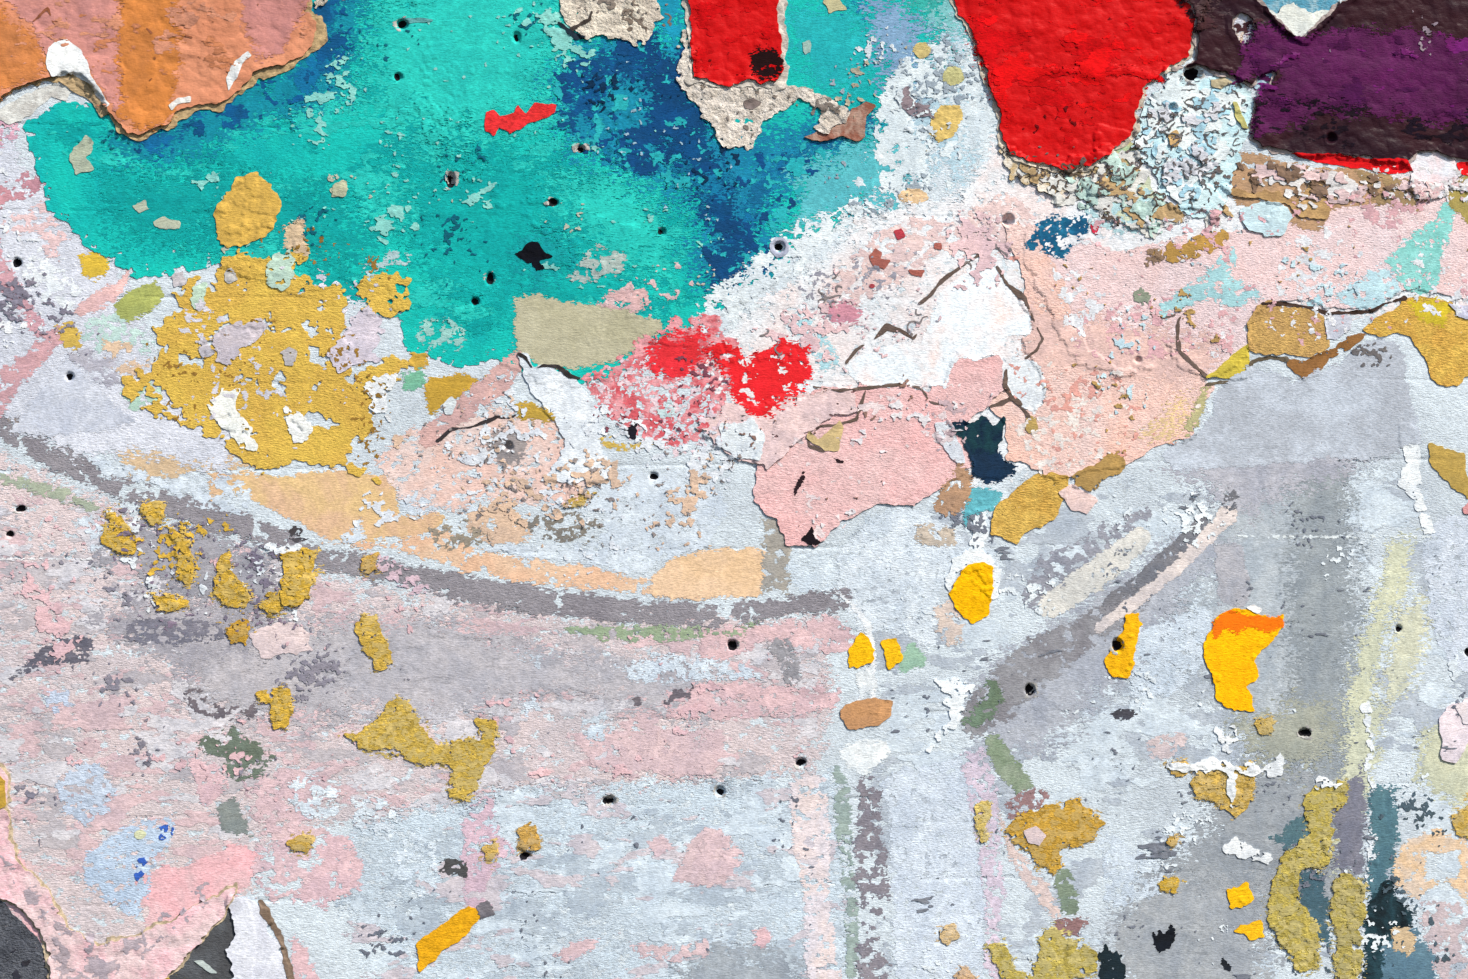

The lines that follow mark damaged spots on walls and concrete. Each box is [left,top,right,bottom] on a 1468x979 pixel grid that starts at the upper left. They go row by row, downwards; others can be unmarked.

spalling [560,0,664,47]
peeling [0,0,328,141]
peeling [485,103,556,136]
peeling [266,249,295,291]
peeling [652,0,1468,548]
crack [1261,295,1407,315]
peeling [195,318,269,366]
peeling [327,270,438,422]
crack [807,238,1044,452]
crack [1150,307,1289,386]
peeling [207,388,258,451]
peeling [283,406,313,443]